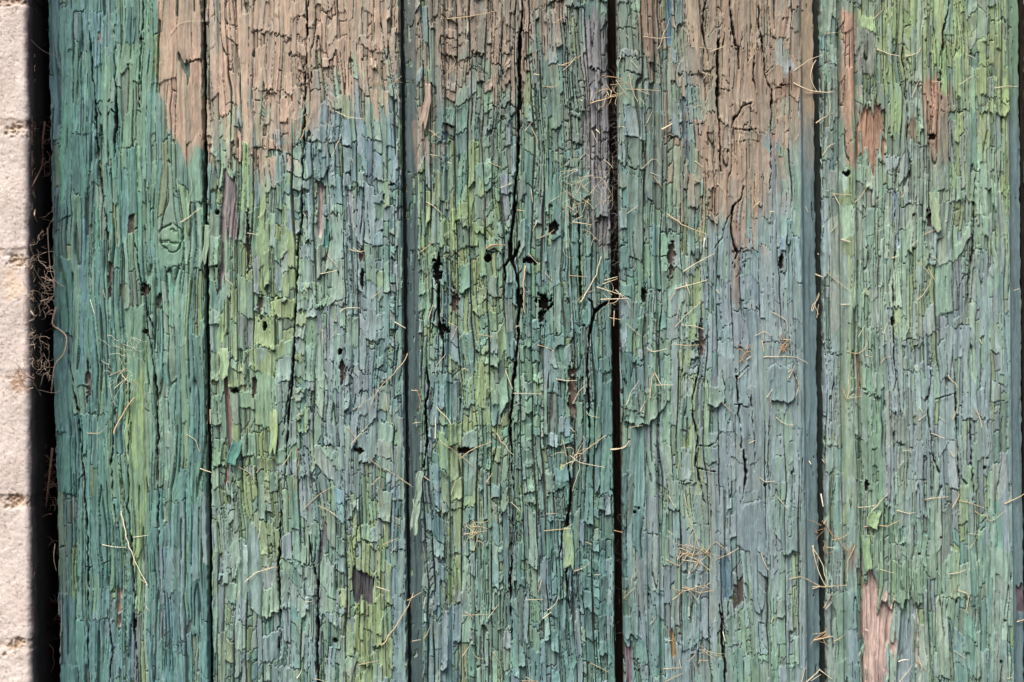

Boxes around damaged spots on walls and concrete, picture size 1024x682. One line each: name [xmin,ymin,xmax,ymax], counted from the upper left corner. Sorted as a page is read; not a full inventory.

peeling [156,0,569,292]
peeling [639,0,813,253]
peeling [839,7,887,177]
crack [503,0,524,642]
crack [559,205,612,610]
peeling [860,508,920,682]